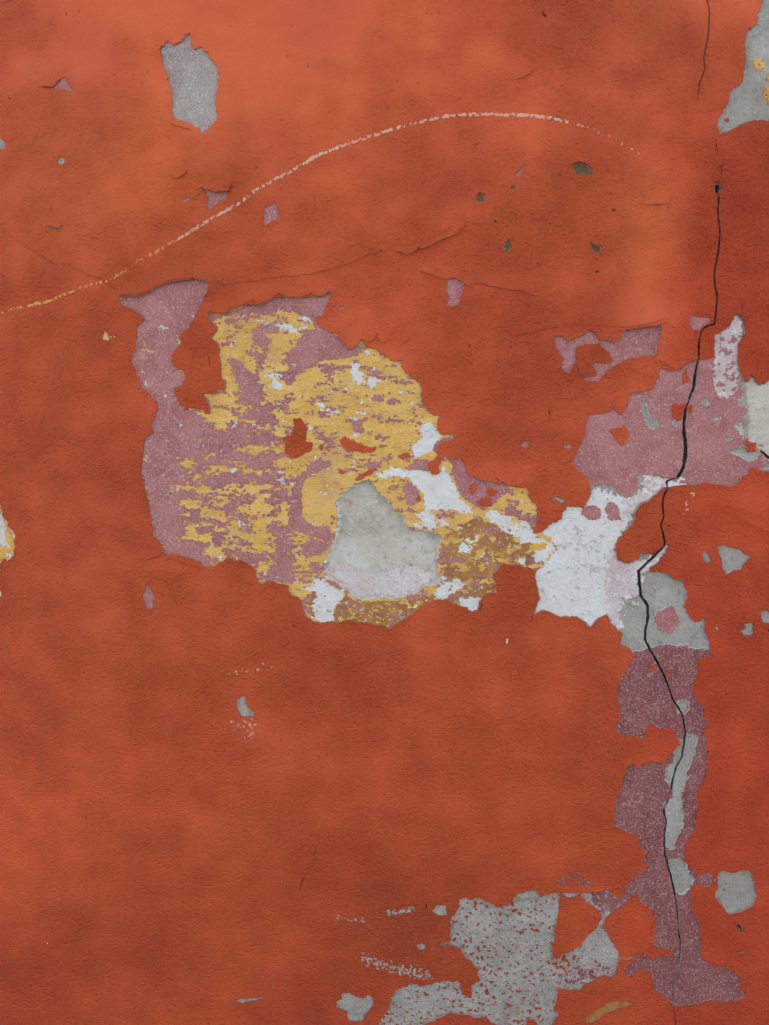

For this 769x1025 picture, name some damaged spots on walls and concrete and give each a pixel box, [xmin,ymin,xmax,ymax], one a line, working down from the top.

peeling [161,35,220,133]
crack [697,0,710,97]
peeling [718,0,769,135]
flaking render [0,505,15,566]
peeling [121,177,769,1025]
crack [637,143,743,957]